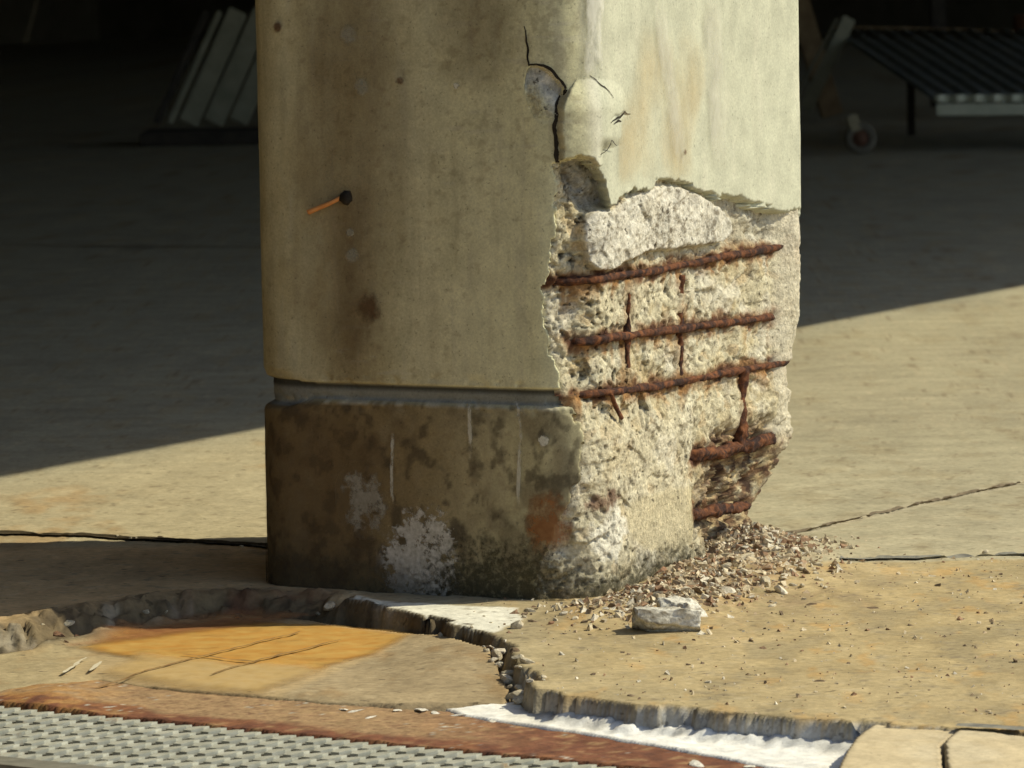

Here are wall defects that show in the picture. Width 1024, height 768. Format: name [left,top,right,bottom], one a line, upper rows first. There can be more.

crack [524,26,567,163]
spalling [525,66,801,599]
water stain [342,440,393,529]
corrosion [527,494,572,545]
crack [785,481,1023,533]
crack [95,631,341,688]